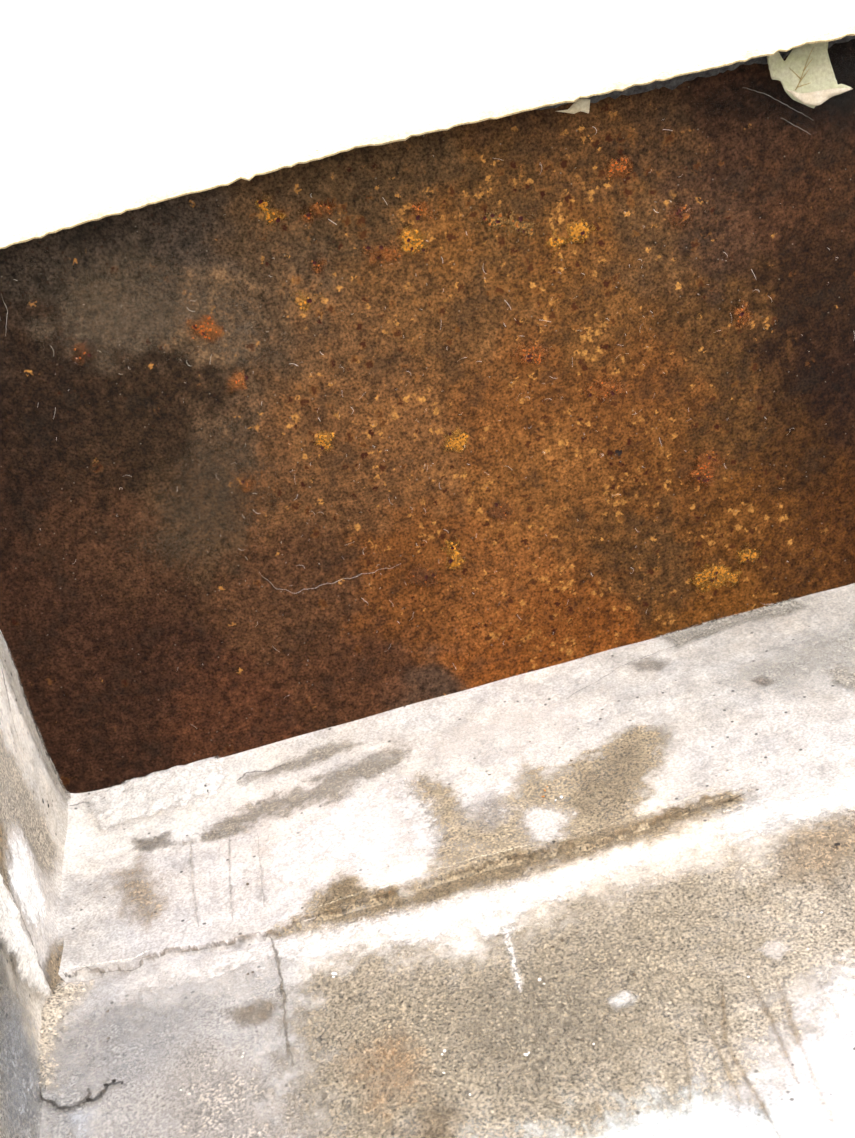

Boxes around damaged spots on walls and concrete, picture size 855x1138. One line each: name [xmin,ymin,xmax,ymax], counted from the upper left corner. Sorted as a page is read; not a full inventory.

rust [608,157,632,178]
rust [256,199,285,223]
rust [363,201,432,263]
rust [483,212,533,236]
rust [549,221,595,249]
rust [316,432,334,450]
rust [445,430,468,452]
rust [410,541,464,587]
rust [694,549,758,593]
damp [0,684,57,926]
crack [64,779,753,1066]
damp [0,725,855,1138]